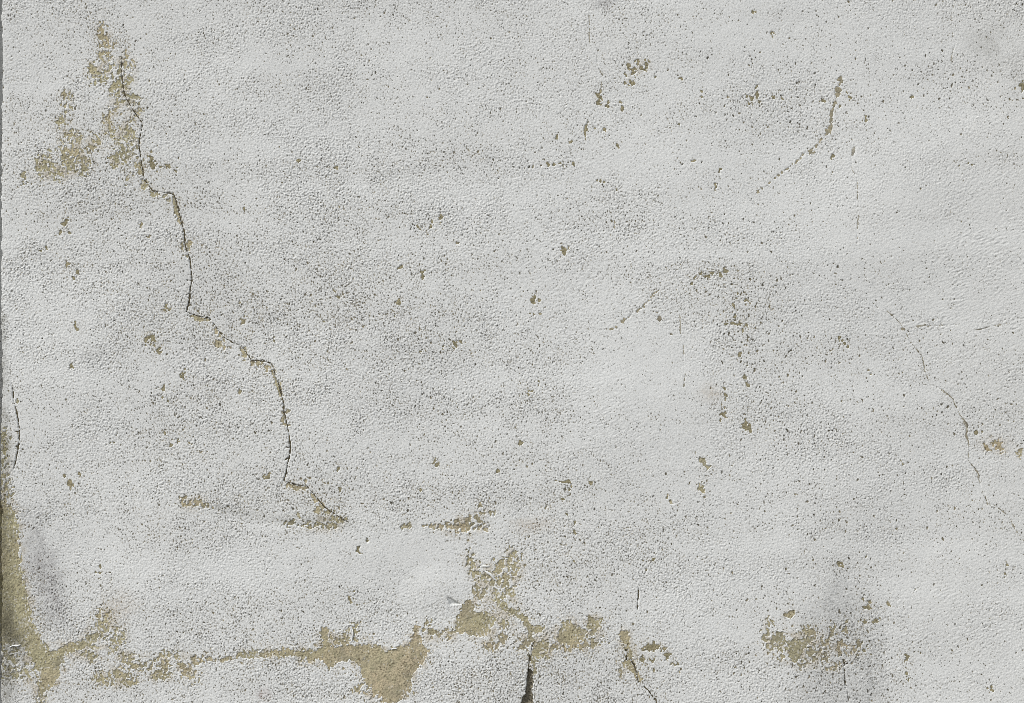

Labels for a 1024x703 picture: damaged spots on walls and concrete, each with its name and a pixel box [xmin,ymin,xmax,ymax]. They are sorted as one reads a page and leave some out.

peeling [20,21,178,186]
crack [121,58,348,530]
spalling [696,457,711,493]
peeling [0,427,680,703]
crack [521,643,535,703]
peeling [759,598,881,671]